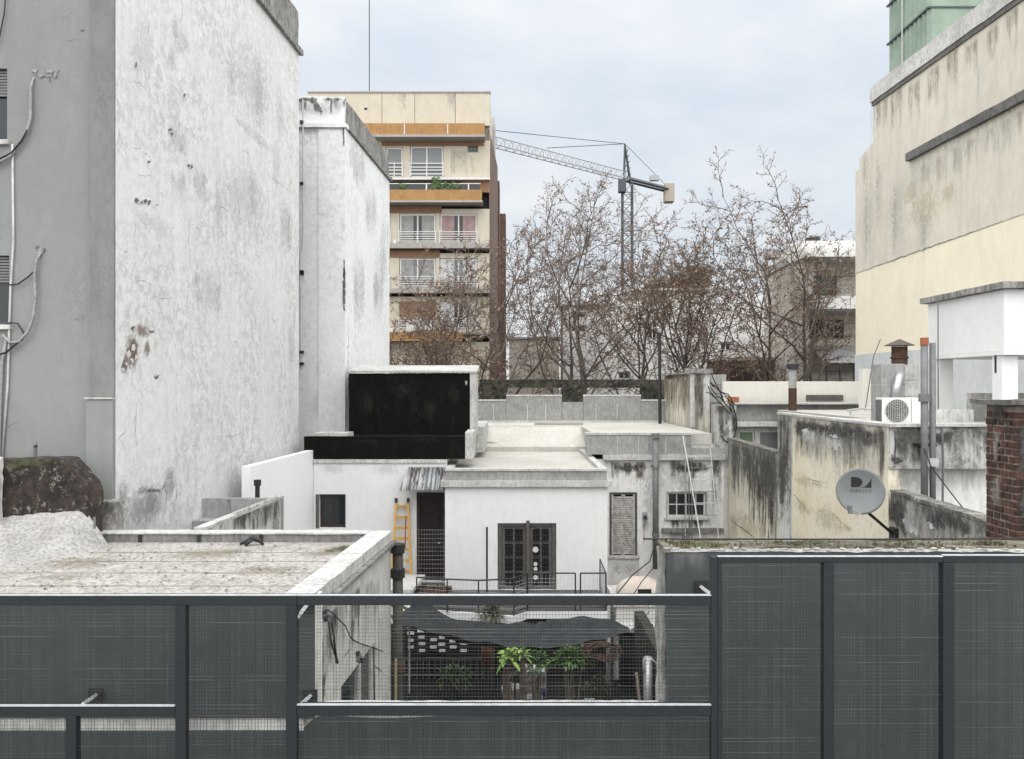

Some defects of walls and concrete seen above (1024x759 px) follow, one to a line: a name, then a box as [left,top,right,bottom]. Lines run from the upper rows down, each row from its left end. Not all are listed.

peeling [121,344,139,372]
leakage [611,462,645,475]
leakage [672,420,921,537]